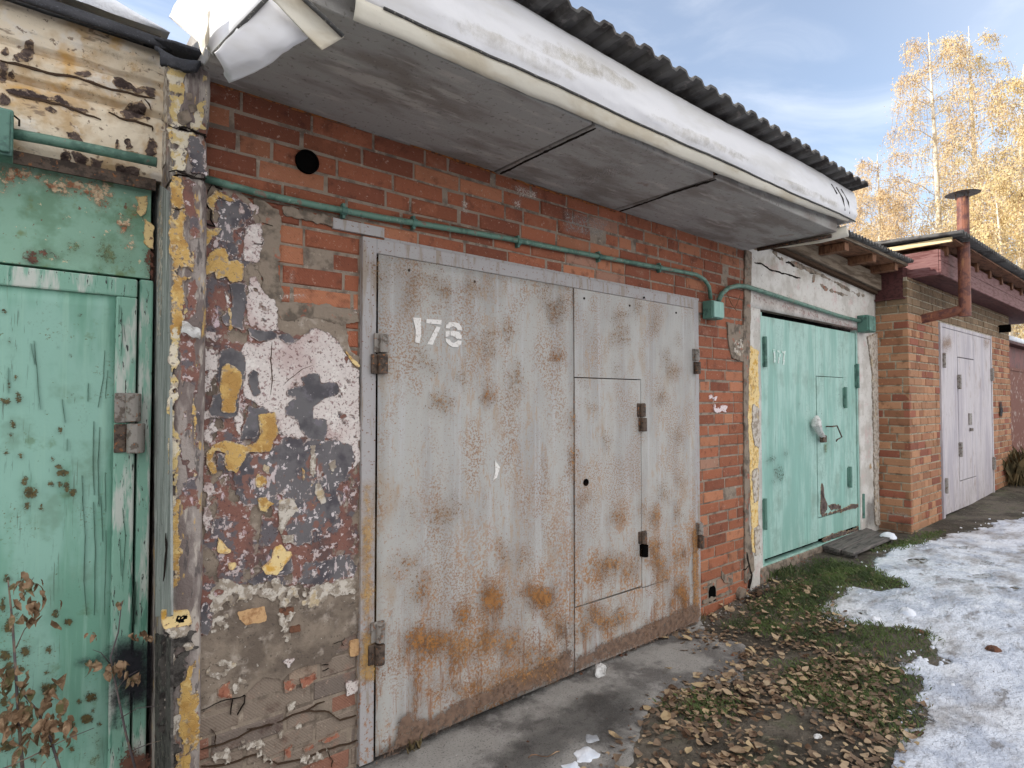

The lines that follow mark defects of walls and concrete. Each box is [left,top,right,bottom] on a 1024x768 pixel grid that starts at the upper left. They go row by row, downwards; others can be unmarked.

spalling [0,39,89,113]
peeling [0,131,140,208]
peeling [112,66,361,768]
rust [425,317,527,427]
peeling [748,346,761,556]
rust [820,483,859,516]
rust [376,472,701,764]
crack [201,695,358,768]